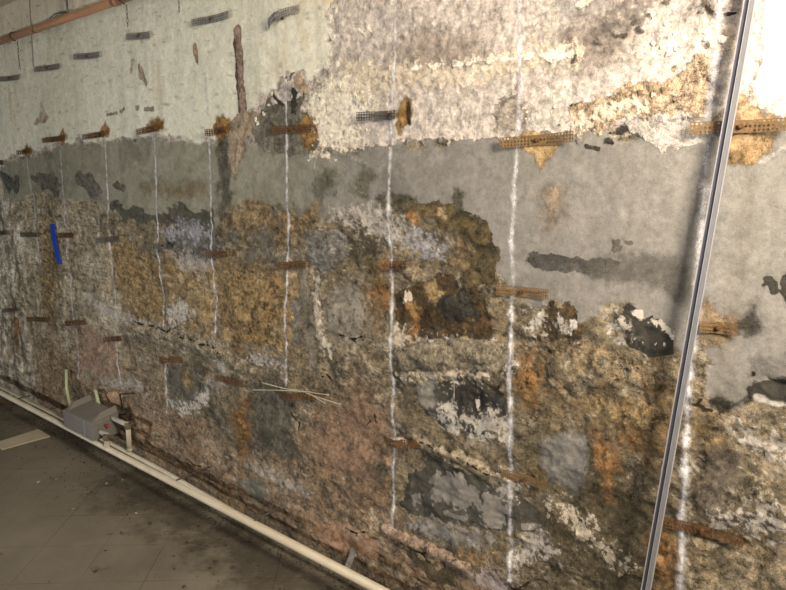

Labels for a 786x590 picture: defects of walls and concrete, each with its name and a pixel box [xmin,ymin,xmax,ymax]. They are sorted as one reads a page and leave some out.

rust [213,114,230,141]
rust [299,115,318,150]
rust [395,96,413,136]
flaking render [225,0,744,175]
rust [727,94,776,166]
flaking render [740,0,786,120]
damp [300,28,587,378]
flaking render [290,266,334,367]
damp [597,299,676,358]
damp [395,367,512,448]
damp [691,355,786,548]
flaking render [313,521,381,560]